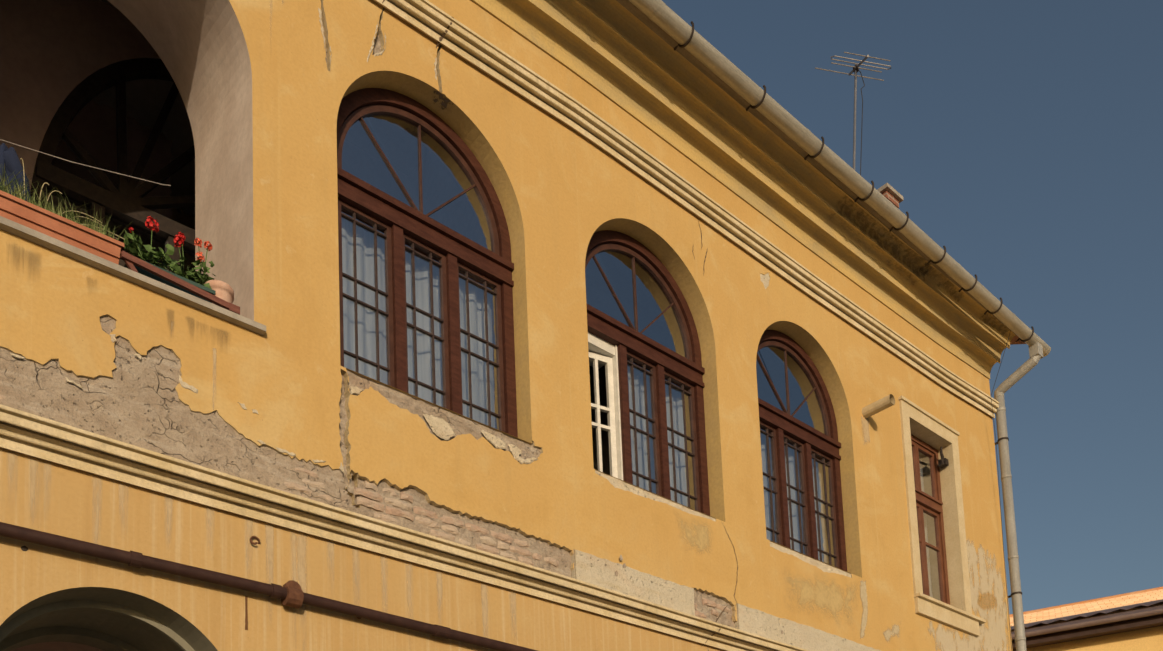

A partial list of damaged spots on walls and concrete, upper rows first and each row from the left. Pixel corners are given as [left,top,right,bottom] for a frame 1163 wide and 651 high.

crack [318,0,332,71]
crack [367,0,386,62]
crack [433,17,453,109]
flaking render [0,314,574,578]
spalling [694,588,737,628]
crack [703,525,738,651]